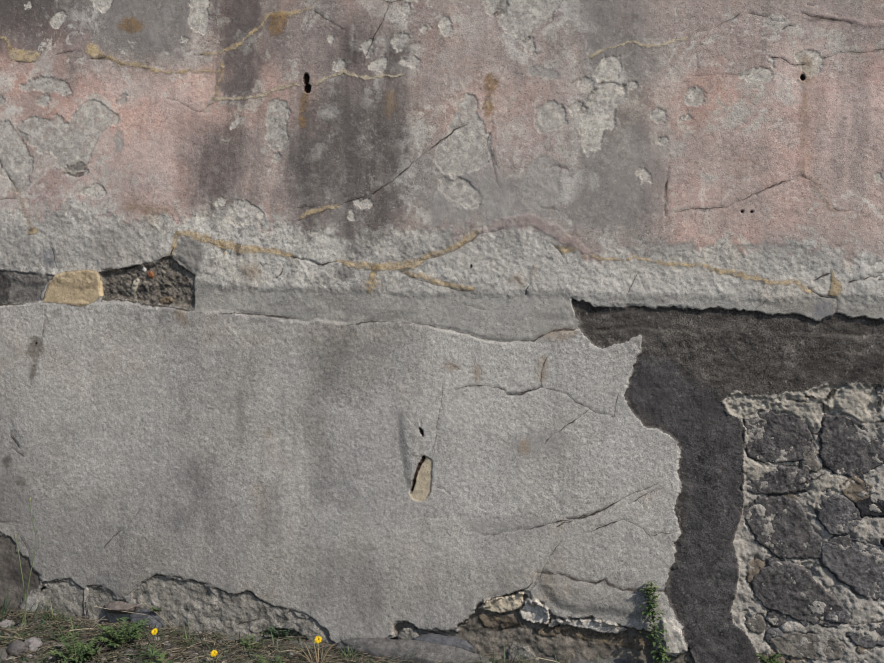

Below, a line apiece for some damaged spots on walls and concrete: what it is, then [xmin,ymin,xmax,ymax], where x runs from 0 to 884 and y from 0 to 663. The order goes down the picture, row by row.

crack [365,0,401,57]
crack [294,124,467,221]
crack [664,177,821,215]
spalling [0,270,54,306]
spalling [99,256,195,309]
crack [223,311,295,319]
crack [348,320,620,444]
spalling [391,299,884,663]
spalling [0,535,335,644]
crack [482,484,673,604]